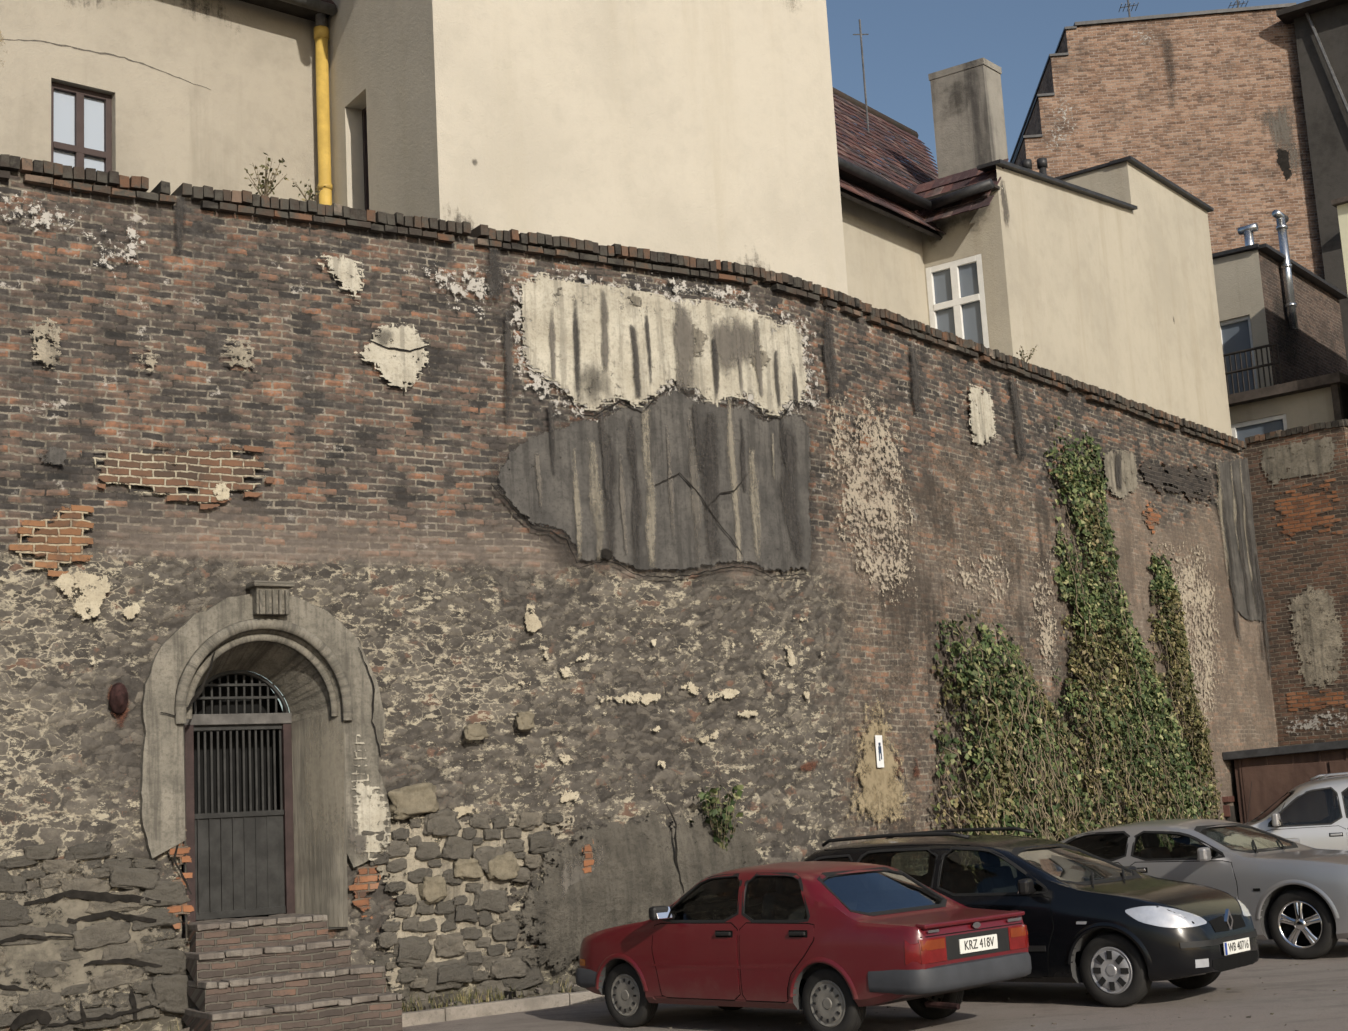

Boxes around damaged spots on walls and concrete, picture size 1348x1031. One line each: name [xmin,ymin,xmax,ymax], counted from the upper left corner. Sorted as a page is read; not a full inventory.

crack [0,39,210,90]
peeling [505,261,823,423]
crack [491,472,807,578]
spalling [599,548,613,560]
spalling [463,723,489,742]
spalling [515,711,535,732]
spalling [349,803,577,1008]